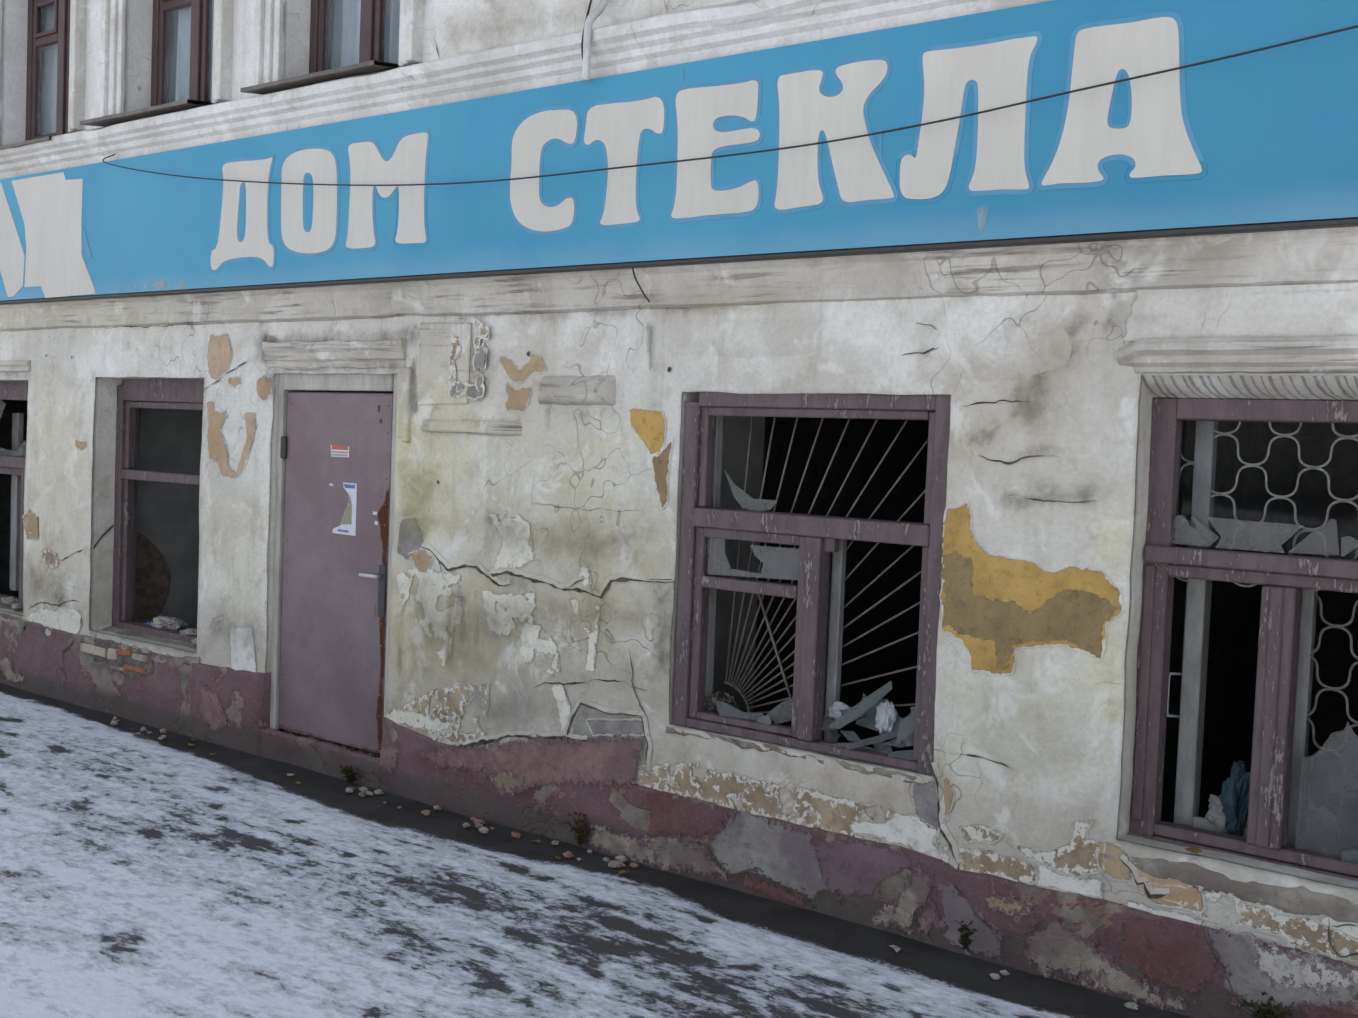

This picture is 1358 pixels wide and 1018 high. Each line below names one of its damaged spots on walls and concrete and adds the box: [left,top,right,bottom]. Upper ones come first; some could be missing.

peeling [206,333,273,480]
peeling [448,319,547,413]
crack [902,323,939,356]
crack [957,399,1033,407]
peeling [628,406,673,510]
crack [979,455,1099,503]
peeling [22,508,59,570]
peeling [395,514,464,667]
peeling [488,510,534,570]
crack [421,543,674,598]
peeling [939,501,1124,676]
peeling [380,589,1358,1018]